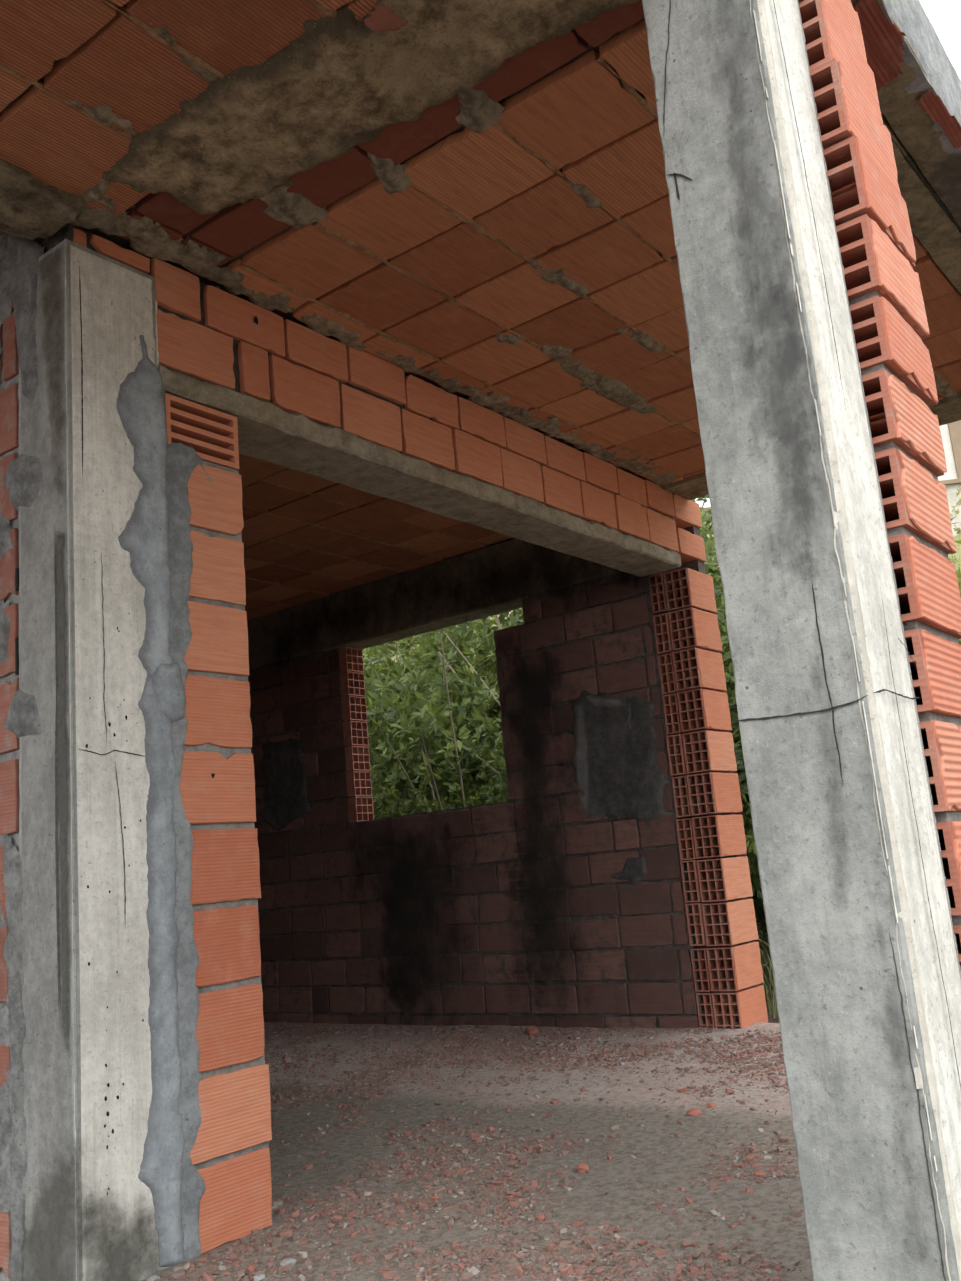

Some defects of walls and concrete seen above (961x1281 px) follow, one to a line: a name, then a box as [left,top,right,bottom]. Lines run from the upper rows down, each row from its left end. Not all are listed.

crack [54,531,143,1011]
leakage [501,643,577,1005]
crack [737,584,961,1088]
leakage [21,1160,162,1281]